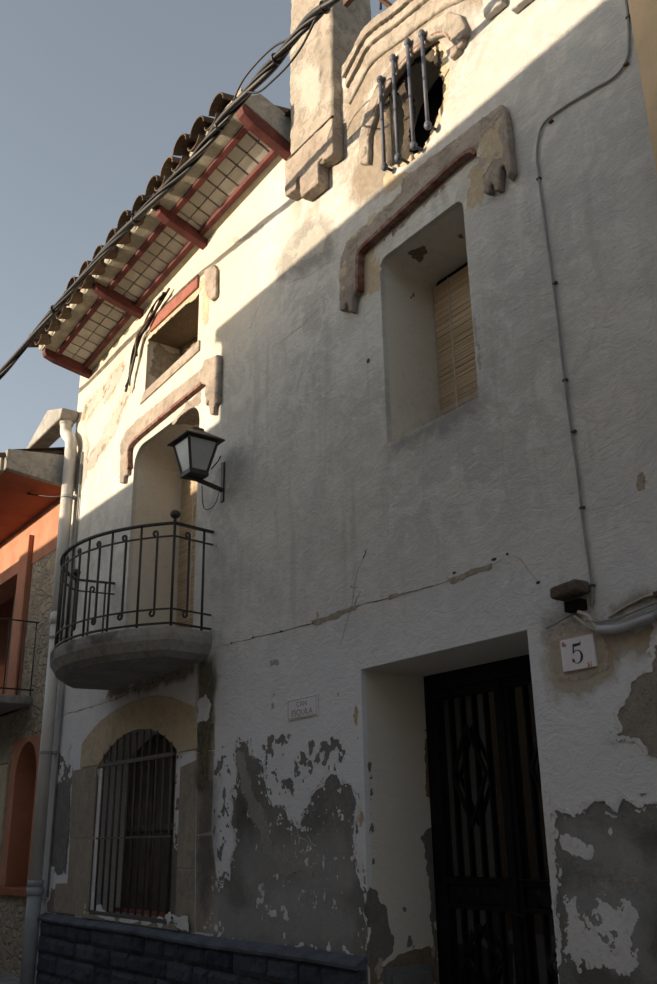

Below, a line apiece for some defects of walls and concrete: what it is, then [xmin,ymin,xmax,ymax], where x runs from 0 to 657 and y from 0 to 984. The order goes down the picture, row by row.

peeling [465,117,503,212]
peeling [361,185,446,296]
crack [216,550,540,648]
water stain [107,660,216,791]
spalling [605,621,657,758]
peeling [46,742,75,917]
peeling [93,770,101,877]
peeling [204,734,394,984]
spalling [421,828,439,984]
peeling [541,783,657,984]